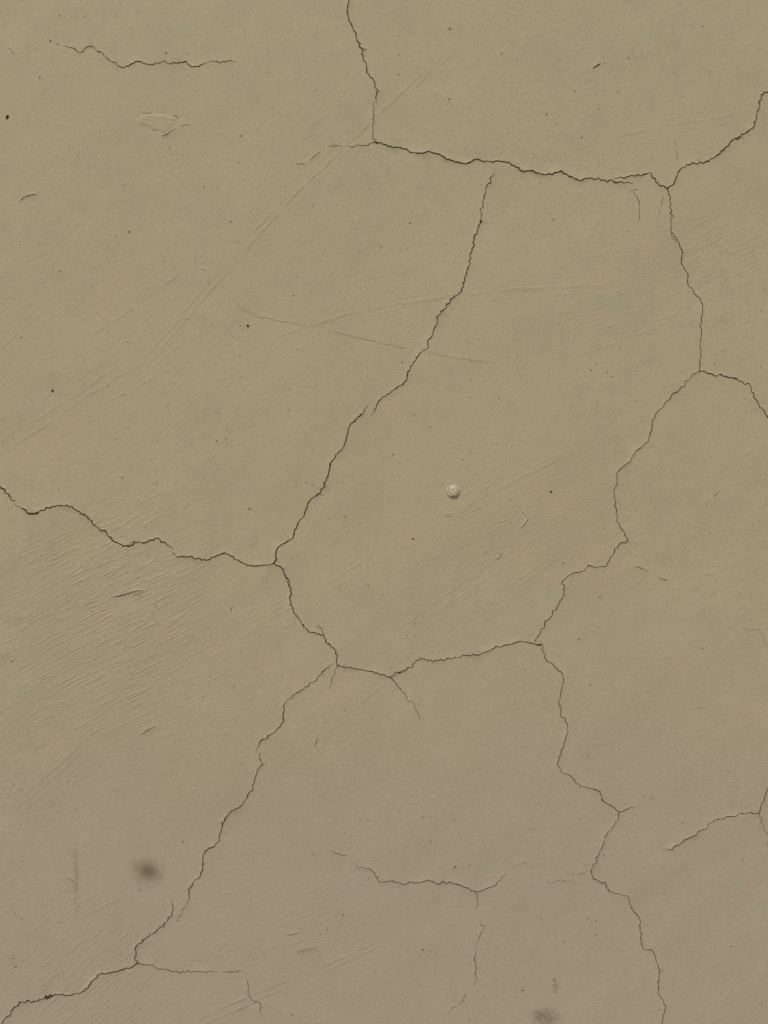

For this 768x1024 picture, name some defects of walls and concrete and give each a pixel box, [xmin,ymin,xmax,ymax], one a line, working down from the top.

crack [56,43,236,68]
crack [347,1,768,475]
crack [0,170,666,1024]
crack [663,789,768,851]